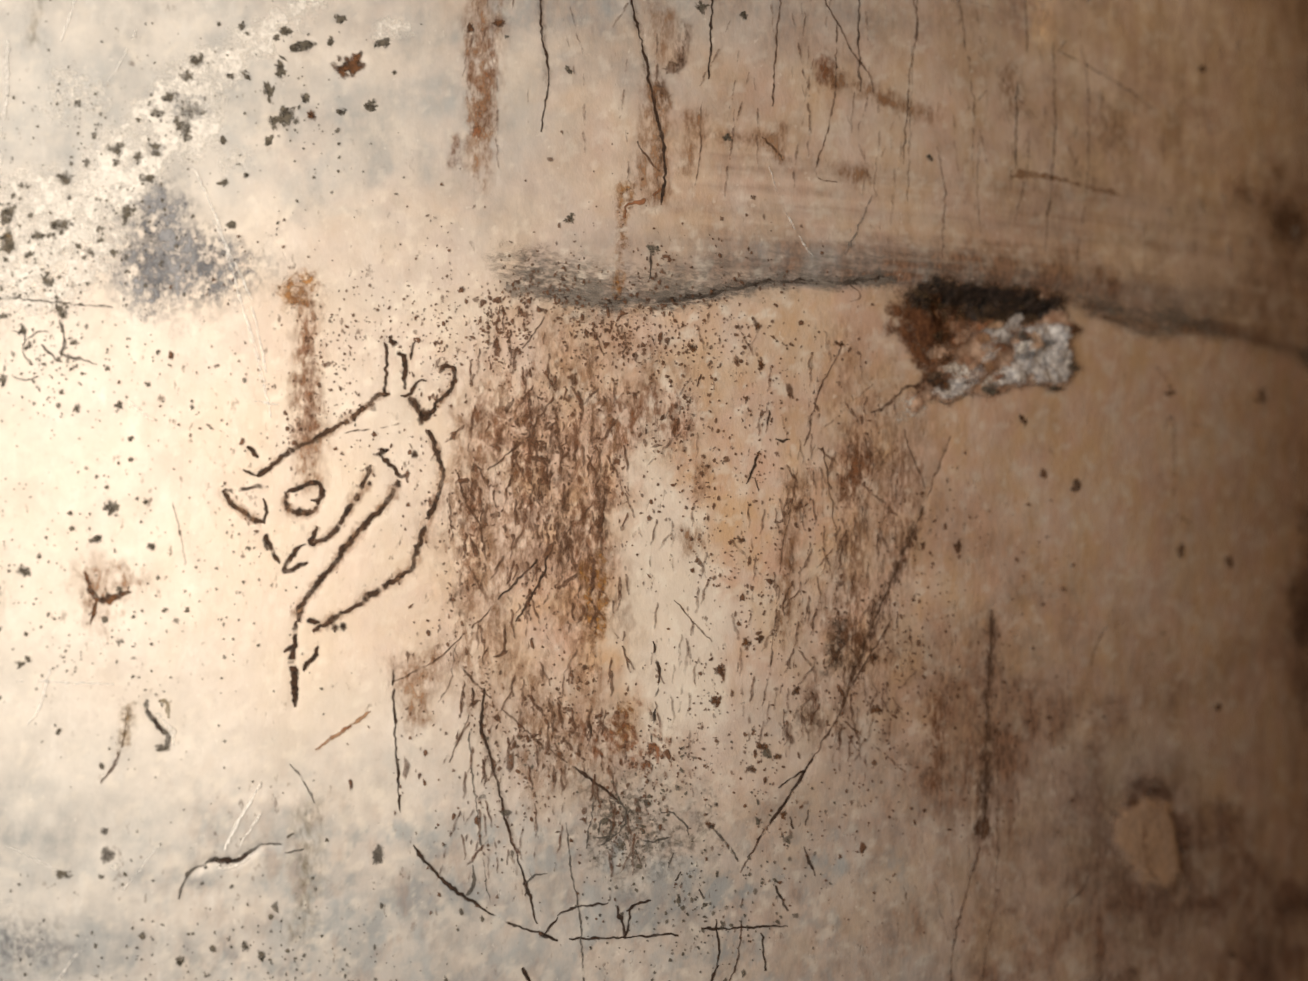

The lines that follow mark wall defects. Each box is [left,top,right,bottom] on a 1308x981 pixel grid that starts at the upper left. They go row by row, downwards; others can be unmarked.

rust [452,0,505,171]
damp [519,257,550,285]
rust [279,273,322,483]
rust [487,392,548,495]
rust [592,367,679,450]
spalling [872,276,1082,416]
rust [531,547,609,636]
rust [546,705,672,773]